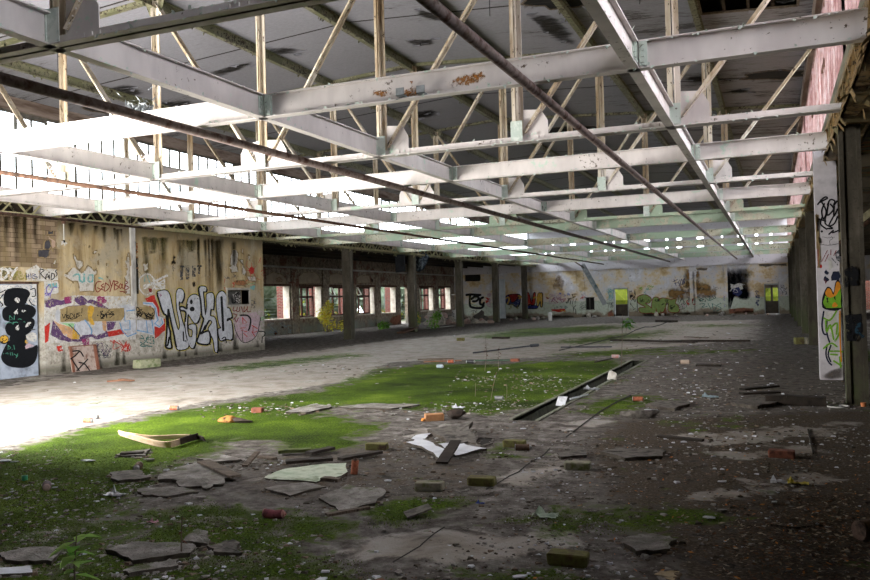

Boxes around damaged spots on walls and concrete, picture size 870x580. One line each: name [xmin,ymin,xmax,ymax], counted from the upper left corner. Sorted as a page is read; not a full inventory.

water stain [527,13,573,43]
corrosion [451,72,485,86]
water stain [0,216,37,242]
water stain [143,237,167,255]
water stain [181,238,222,281]
water stain [669,269,716,303]